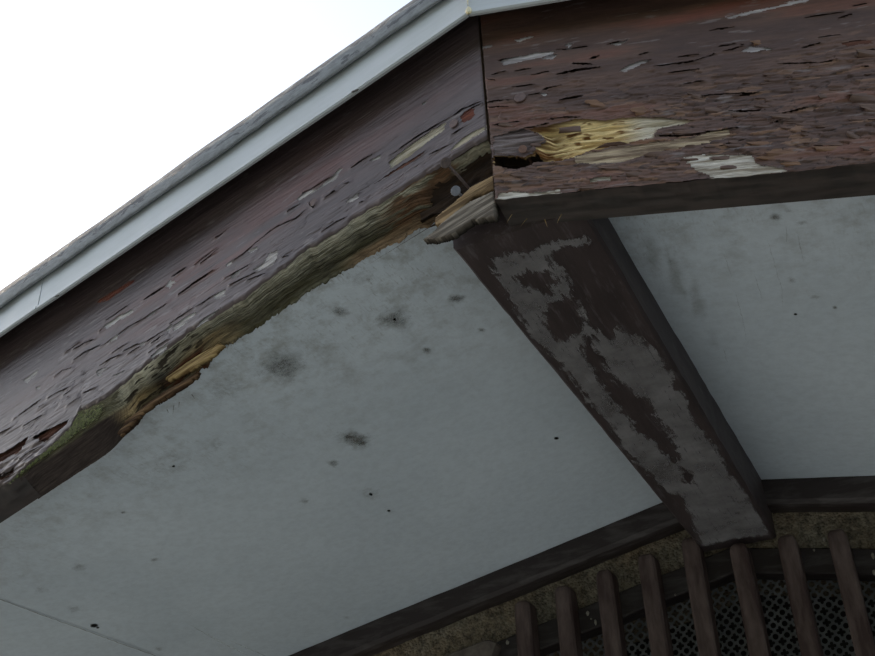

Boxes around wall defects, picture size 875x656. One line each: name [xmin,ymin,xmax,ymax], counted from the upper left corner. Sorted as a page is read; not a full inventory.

peeling [727,0,809,19]
peeling [501,51,557,65]
peeling [741,40,772,52]
peeling [451,125,487,151]
peeling [370,123,446,184]
peeling [684,153,787,179]
peeling [497,175,570,200]
peeling [253,250,279,272]
peeling [489,235,769,546]
peeling [0,421,68,462]